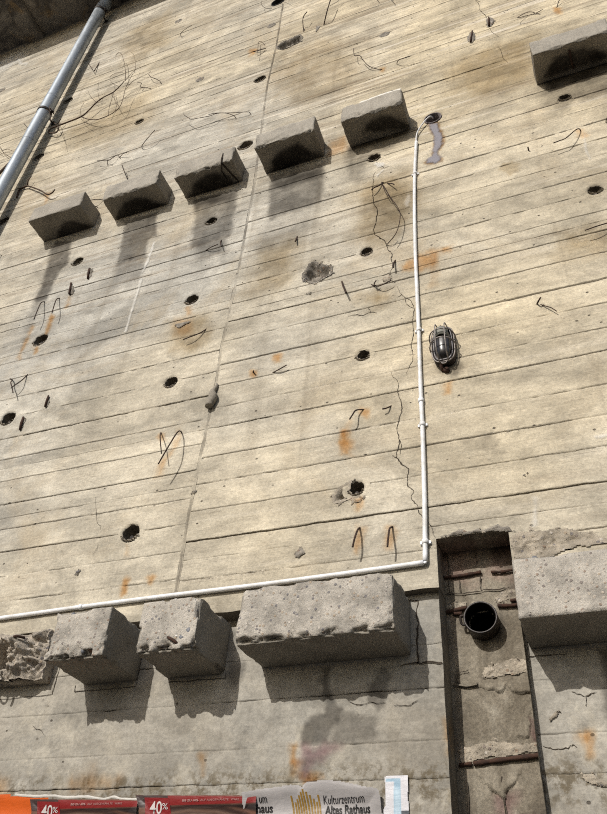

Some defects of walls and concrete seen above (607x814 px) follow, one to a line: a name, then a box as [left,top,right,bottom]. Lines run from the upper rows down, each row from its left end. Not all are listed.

spalling [301,260,335,294]
crack [372,162,434,535]
spalling [330,476,371,506]
spalling [440,524,607,559]
spalling [443,570,481,579]
spalling [0,629,55,688]
spalling [452,657,538,800]